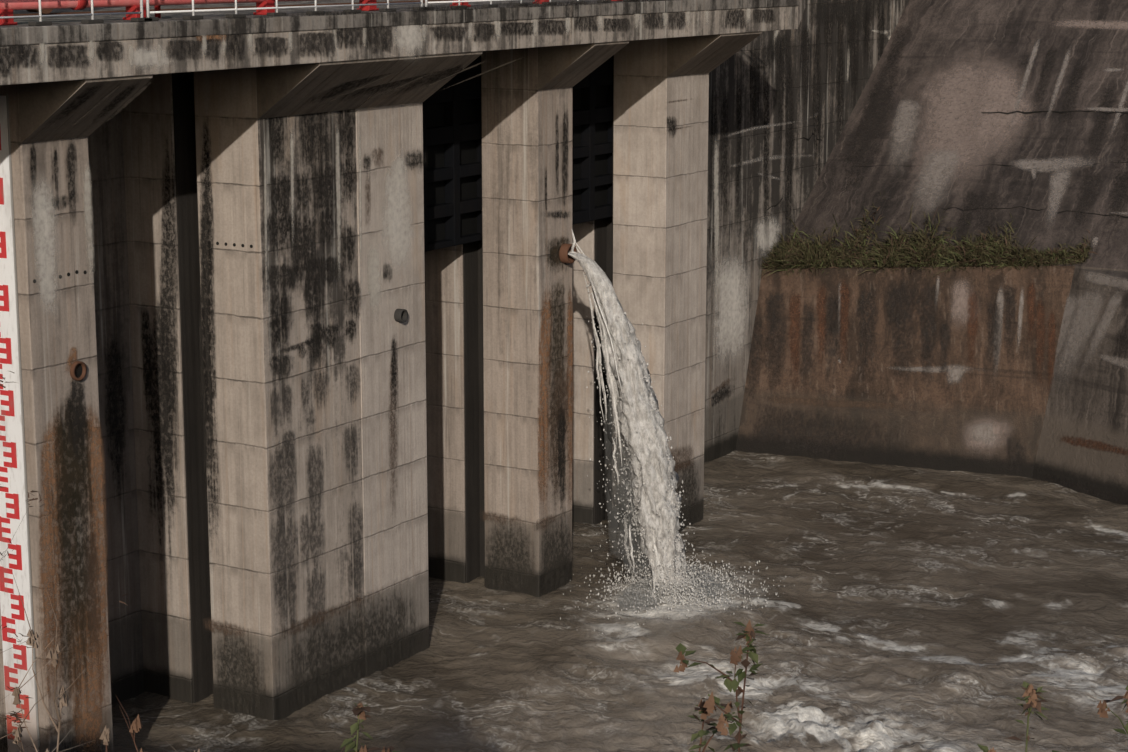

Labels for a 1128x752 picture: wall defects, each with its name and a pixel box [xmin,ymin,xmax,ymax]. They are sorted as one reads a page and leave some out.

damp [30,143,93,310]
damp [0,0,690,76]
damp [545,112,568,218]
damp [710,8,1082,455]
crack [981,109,1128,117]
damp [1016,68,1128,224]
damp [1058,20,1128,30]
damp [141,140,178,508]
damp [263,59,517,707]
corrosion [538,284,573,501]
damp [1055,272,1128,372]
corrosion [38,348,108,752]